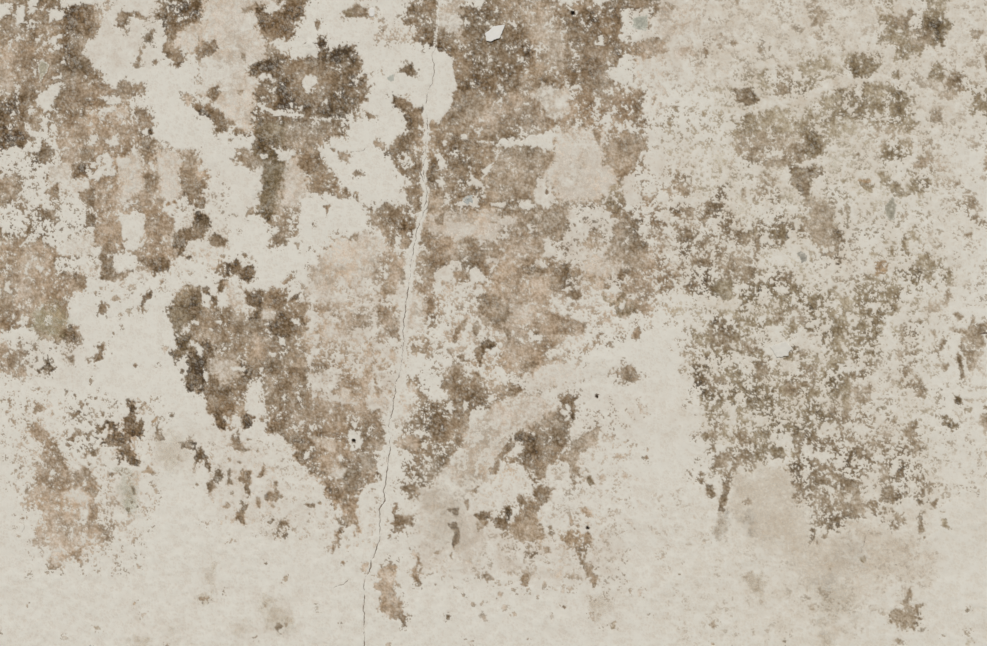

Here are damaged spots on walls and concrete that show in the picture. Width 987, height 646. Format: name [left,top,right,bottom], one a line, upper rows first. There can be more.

peeling [387,59,420,82]
peeling [112,0,378,252]
peeling [962,120,987,183]
peeling [94,287,121,317]
peeling [125,288,156,318]
peeling [0,334,57,385]
peeling [91,341,109,363]
peeling [602,357,647,386]
peeling [953,394,974,408]
peeling [7,387,165,577]
peeling [390,502,416,537]
peeling [916,510,930,538]